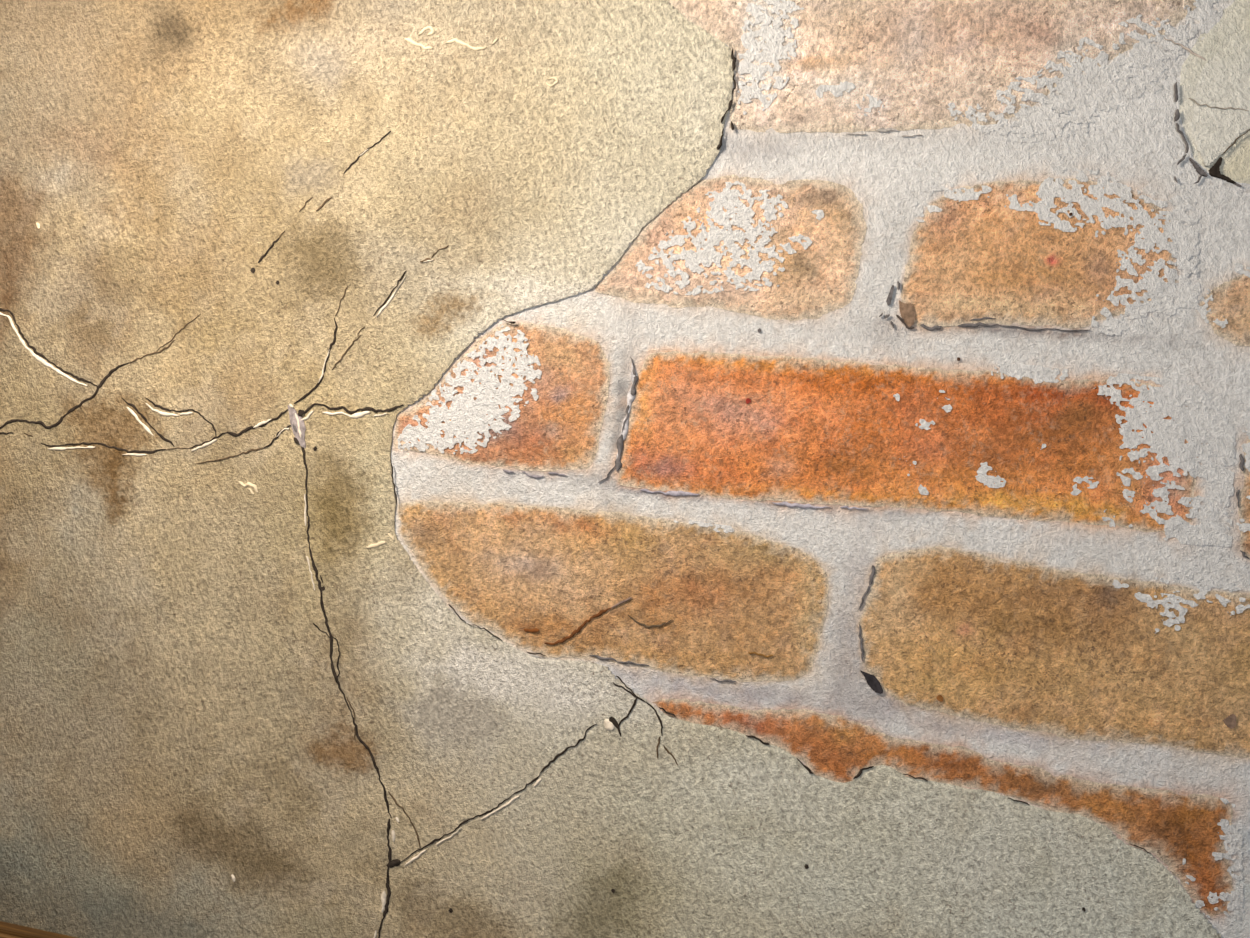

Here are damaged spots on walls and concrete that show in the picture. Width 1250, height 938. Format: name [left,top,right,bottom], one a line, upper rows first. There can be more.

crack [1164,38,1205,60]
crack [258,131,391,263]
crack [1174,82,1250,184]
spalling [391,0,1250,938]
crack [0,245,678,938]